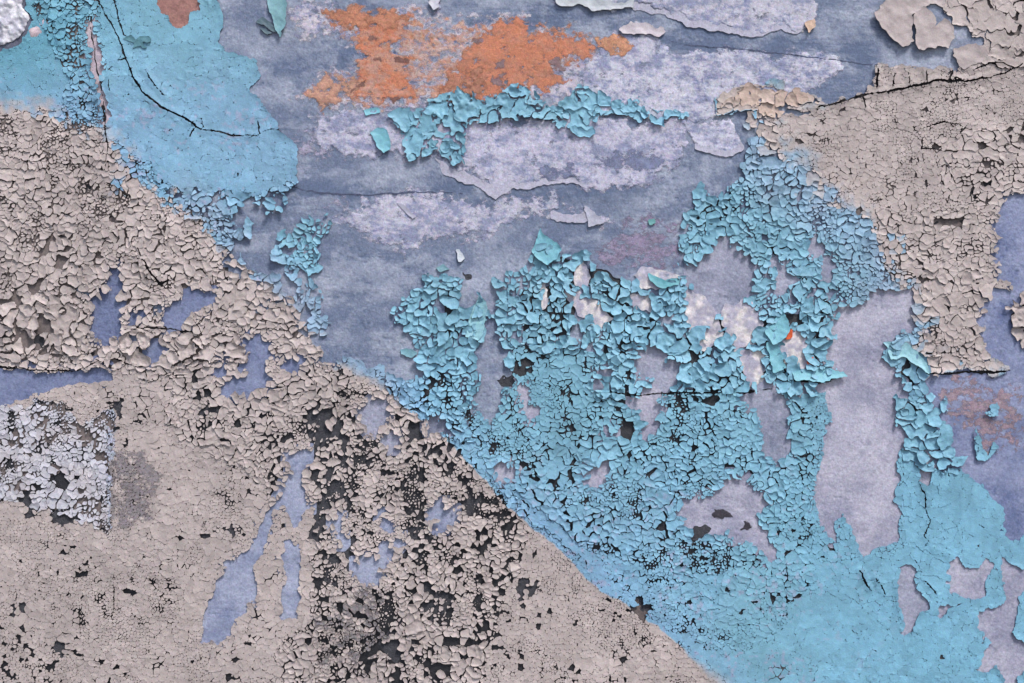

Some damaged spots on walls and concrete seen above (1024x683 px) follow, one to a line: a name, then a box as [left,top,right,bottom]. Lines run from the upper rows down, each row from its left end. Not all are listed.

peeling [0,0,33,52]
crack [88,0,279,167]
rust [304,3,634,112]
peeling [435,158,587,199]
peeling [387,73,689,166]
peeling [695,142,744,157]
peeling [776,100,811,117]
crack [670,41,1021,110]
peeling [550,210,588,223]
peeling [1005,300,1024,348]
peeling [0,398,117,534]
peeling [892,551,1024,683]